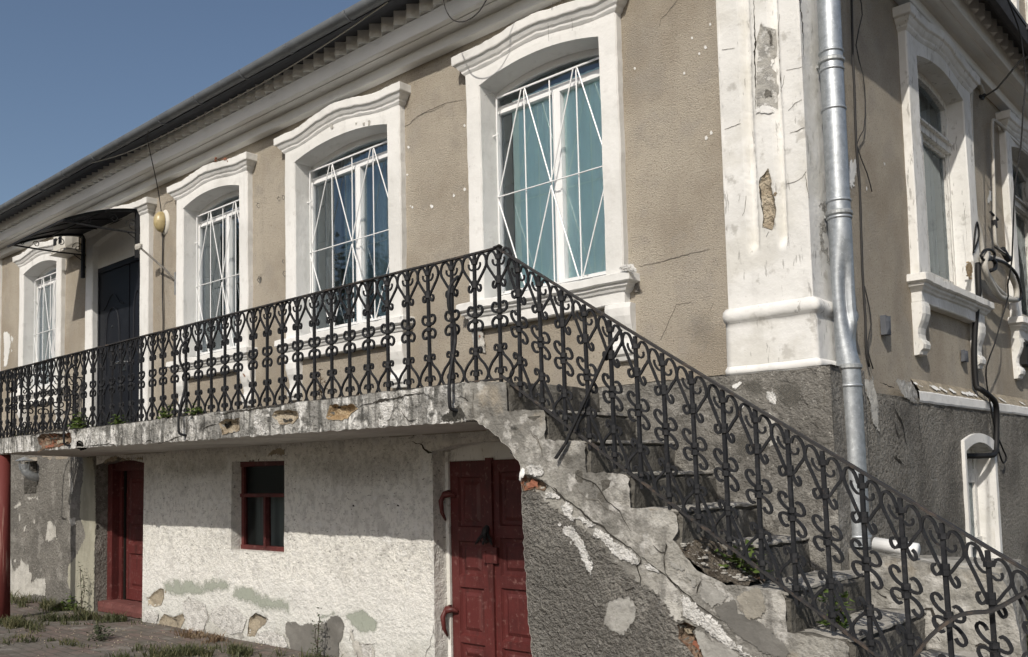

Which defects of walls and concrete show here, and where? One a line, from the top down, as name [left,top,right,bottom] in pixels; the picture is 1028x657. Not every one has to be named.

spalling [755,23,778,114]
spalling [759,169,778,230]
spalling [37,433,72,453]
spalling [219,418,240,435]
spalling [254,410,299,435]
spalling [326,404,358,420]
peeling [14,496,57,542]
peeling [10,555,46,598]
crack [544,474,719,620]
peeling [519,463,752,657]
peeling [147,588,287,648]
peeling [349,629,375,657]